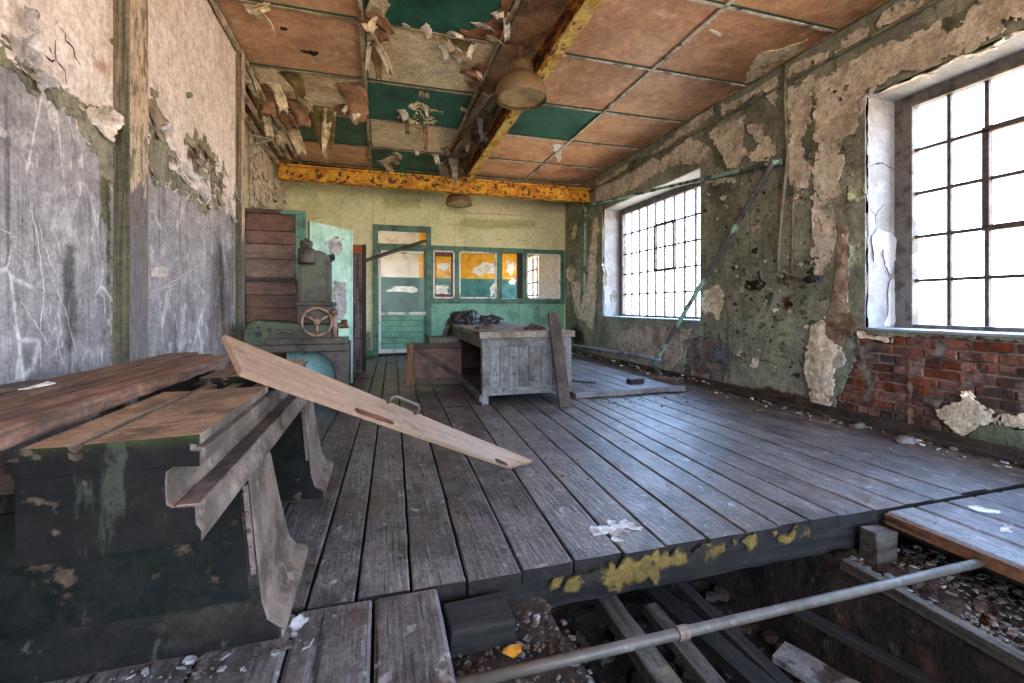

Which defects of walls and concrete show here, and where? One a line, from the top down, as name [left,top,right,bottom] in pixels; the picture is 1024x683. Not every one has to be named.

peeling [0,33,125,183]
crack [45,27,81,82]
peeling [148,0,513,223]
peeling [472,259,517,297]
peeling [534,0,1024,449]